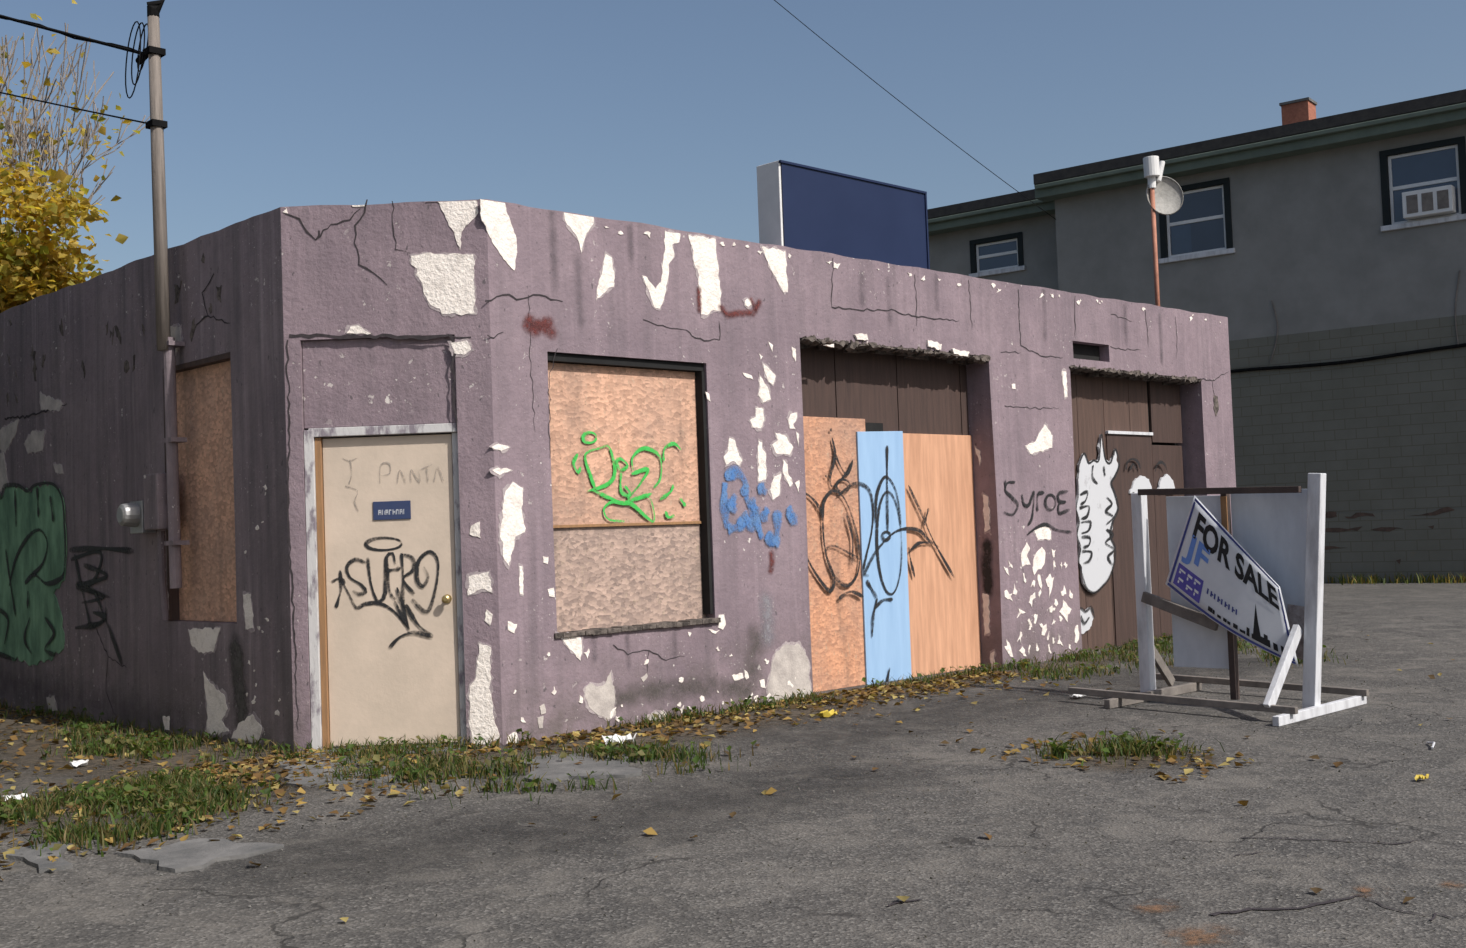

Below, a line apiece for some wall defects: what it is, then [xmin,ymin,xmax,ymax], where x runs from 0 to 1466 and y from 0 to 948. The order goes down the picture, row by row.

crack [285,199,408,285]
peeling [409,199,517,318]
peeling [562,213,623,253]
peeling [595,251,615,300]
peeling [641,229,791,319]
peeling [723,342,800,501]
peeling [465,442,526,633]
peeling [981,526,1079,668]
peeling [188,626,281,744]
peeling [466,641,557,747]
peeling [579,669,623,722]
peeling [645,641,812,721]